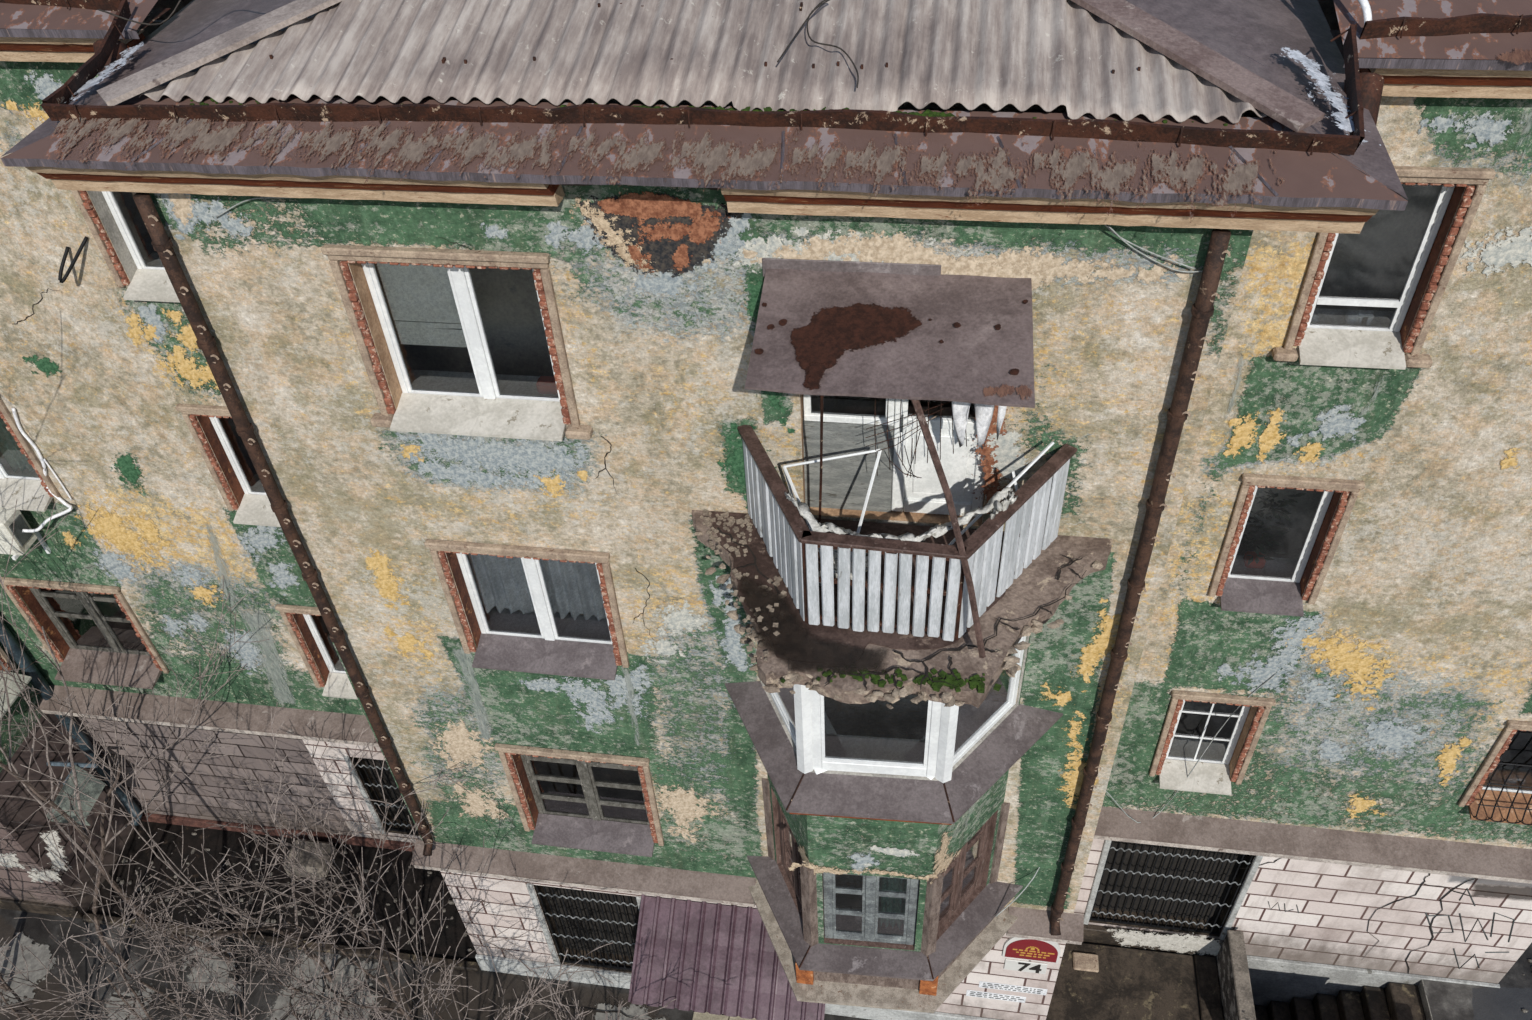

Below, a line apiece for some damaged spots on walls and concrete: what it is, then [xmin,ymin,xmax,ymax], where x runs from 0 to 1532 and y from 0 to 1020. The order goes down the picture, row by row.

peeling [1,71,62,130]
peeling [1411,106,1523,152]
spalling [542,191,1189,333]
peeling [118,302,219,397]
rust [762,302,932,390]
peeling [62,503,263,676]
peeling [517,555,965,734]
peeling [1216,604,1473,786]
peeling [420,713,519,823]
peeling [656,784,722,845]
crack [283,953,397,1020]
crack [556,987,640,1020]